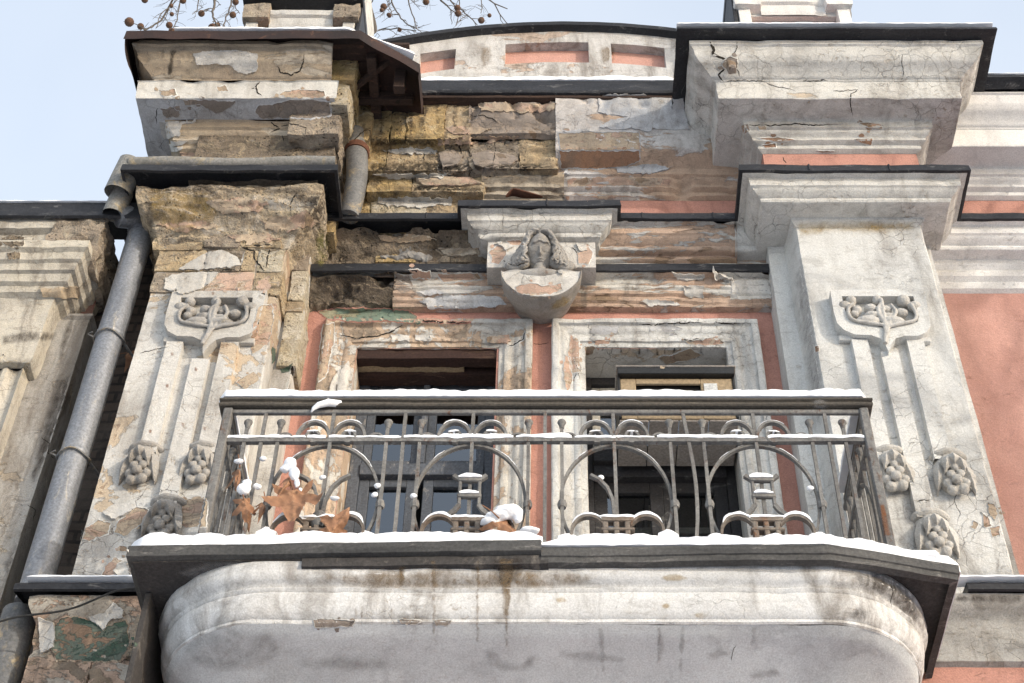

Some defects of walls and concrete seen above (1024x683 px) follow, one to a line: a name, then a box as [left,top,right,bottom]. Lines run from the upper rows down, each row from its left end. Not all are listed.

peeling [154,85,237,152]
peeling [193,50,258,74]
peeling [254,87,332,121]
crack [709,41,885,128]
spalling [355,93,690,213]
spalling [136,182,563,399]
peeling [641,266,772,307]
peeling [80,502,149,575]
peeling [182,495,209,529]
leakage [345,560,574,627]
peeling [34,602,140,683]